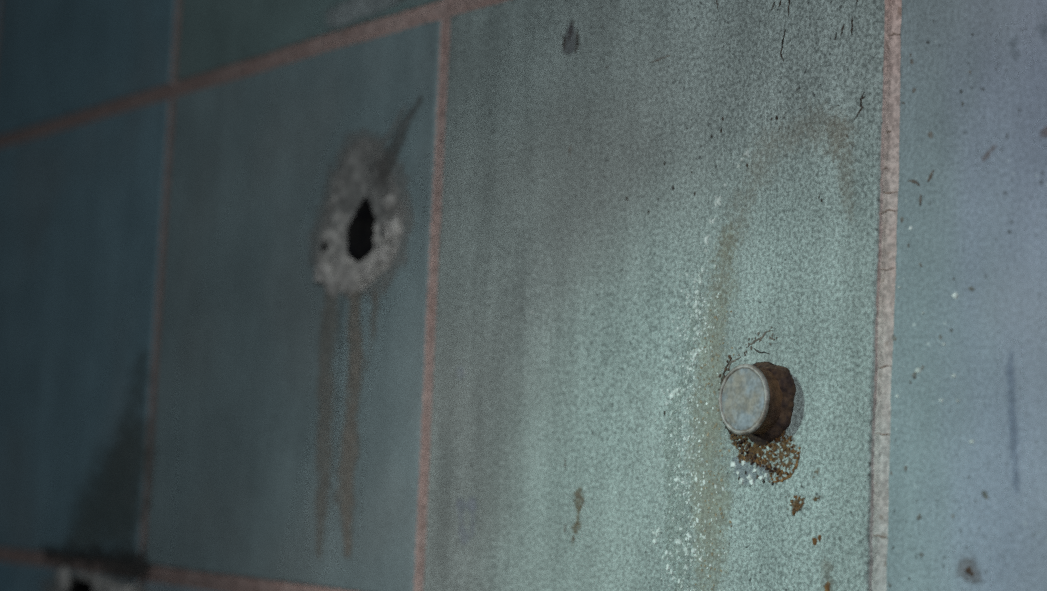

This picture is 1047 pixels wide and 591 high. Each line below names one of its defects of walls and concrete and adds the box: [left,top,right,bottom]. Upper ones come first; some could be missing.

crack [771,0,790,62]
crack [835,0,858,39]
crack [854,91,865,120]
hole [310,106,413,299]
damp [334,290,363,556]
corrosion [730,429,801,483]
corrosion [564,488,584,543]
corrosion [787,495,820,516]
hole [41,566,144,591]